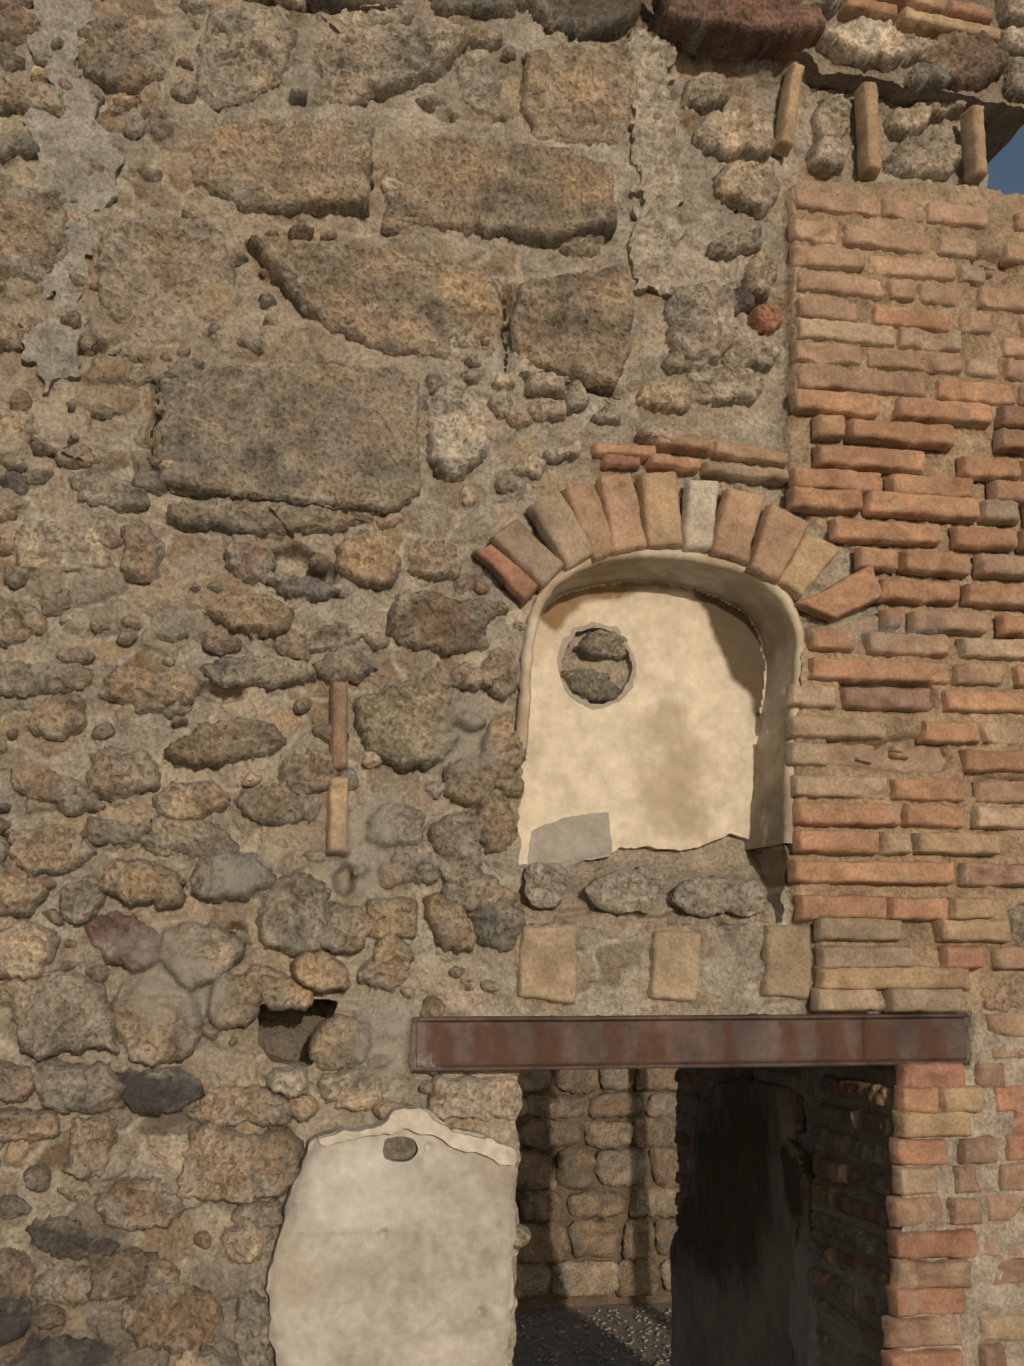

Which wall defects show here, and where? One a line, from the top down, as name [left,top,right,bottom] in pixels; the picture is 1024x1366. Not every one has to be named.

crack [500,295,621,405]
damp [679,1084,813,1276]